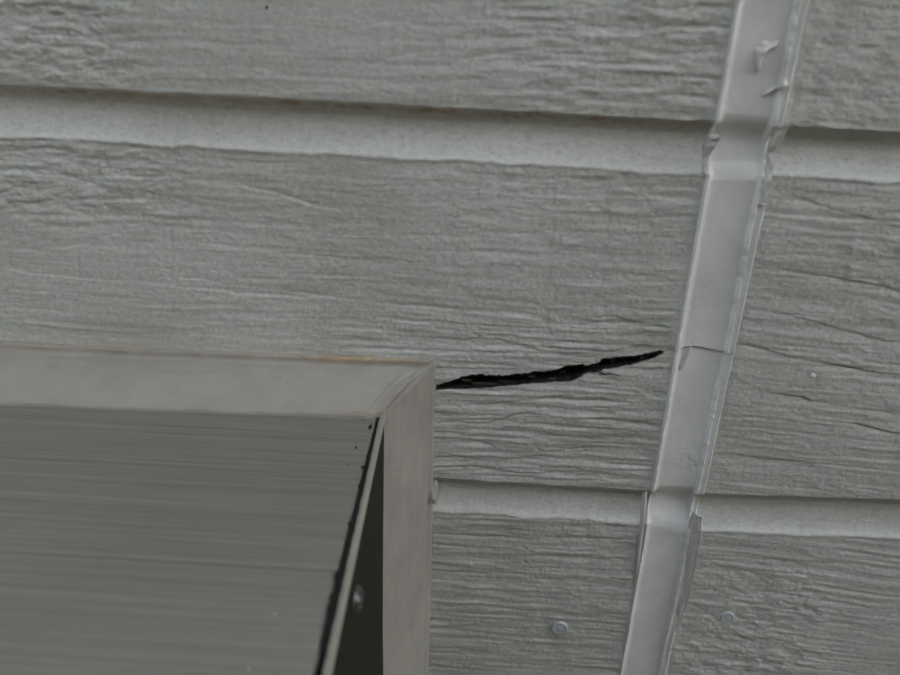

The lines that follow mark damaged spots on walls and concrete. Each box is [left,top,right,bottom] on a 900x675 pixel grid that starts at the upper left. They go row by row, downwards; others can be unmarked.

crack [436,346,734,390]